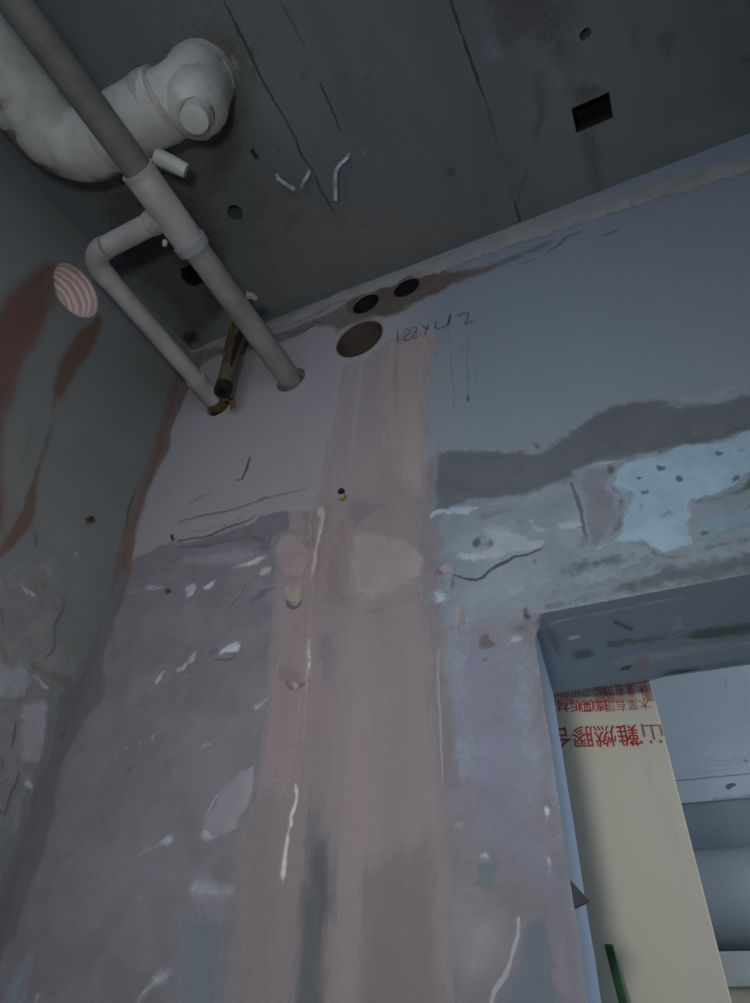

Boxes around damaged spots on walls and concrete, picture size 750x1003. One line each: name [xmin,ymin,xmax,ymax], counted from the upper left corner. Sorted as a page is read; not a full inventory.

crack [223,0,335,214]
crack [319,82,341,133]
crack [449,0,498,145]
rust [0,264,58,439]
rust [53,314,101,406]
rust [0,418,50,557]
crack [453,548,542,581]
spalling [0,510,313,1003]
spalling [413,389,750,1003]